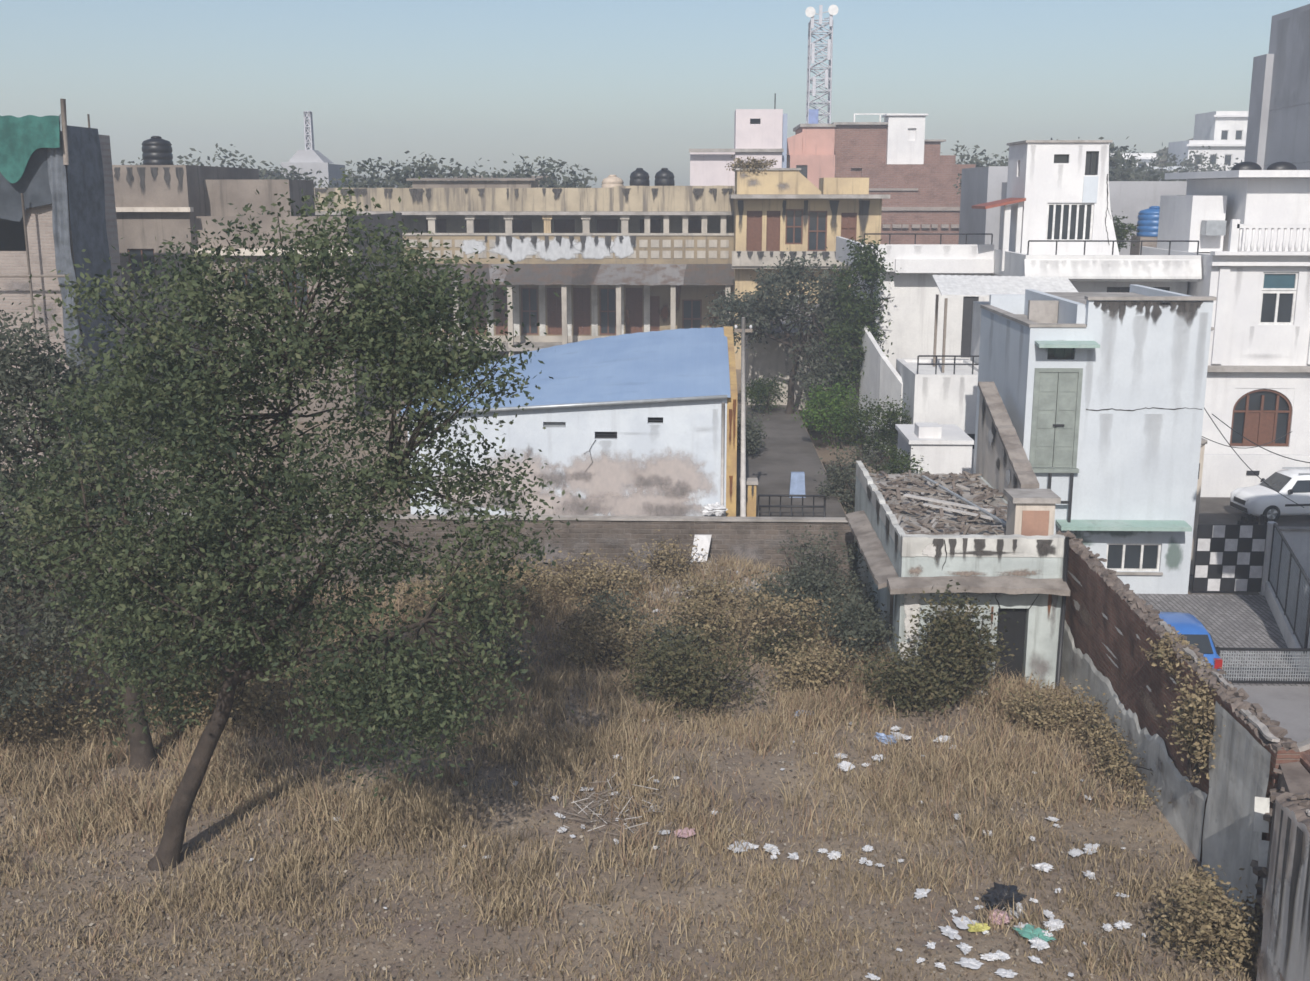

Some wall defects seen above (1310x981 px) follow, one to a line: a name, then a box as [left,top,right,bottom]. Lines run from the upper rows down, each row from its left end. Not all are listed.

peeling [461,236,634,262]
damp [1094,301,1203,323]
damp [640,477,688,516]
damp [933,538,1017,562]
damp [1036,539,1056,556]
damp [1265,801,1310,970]